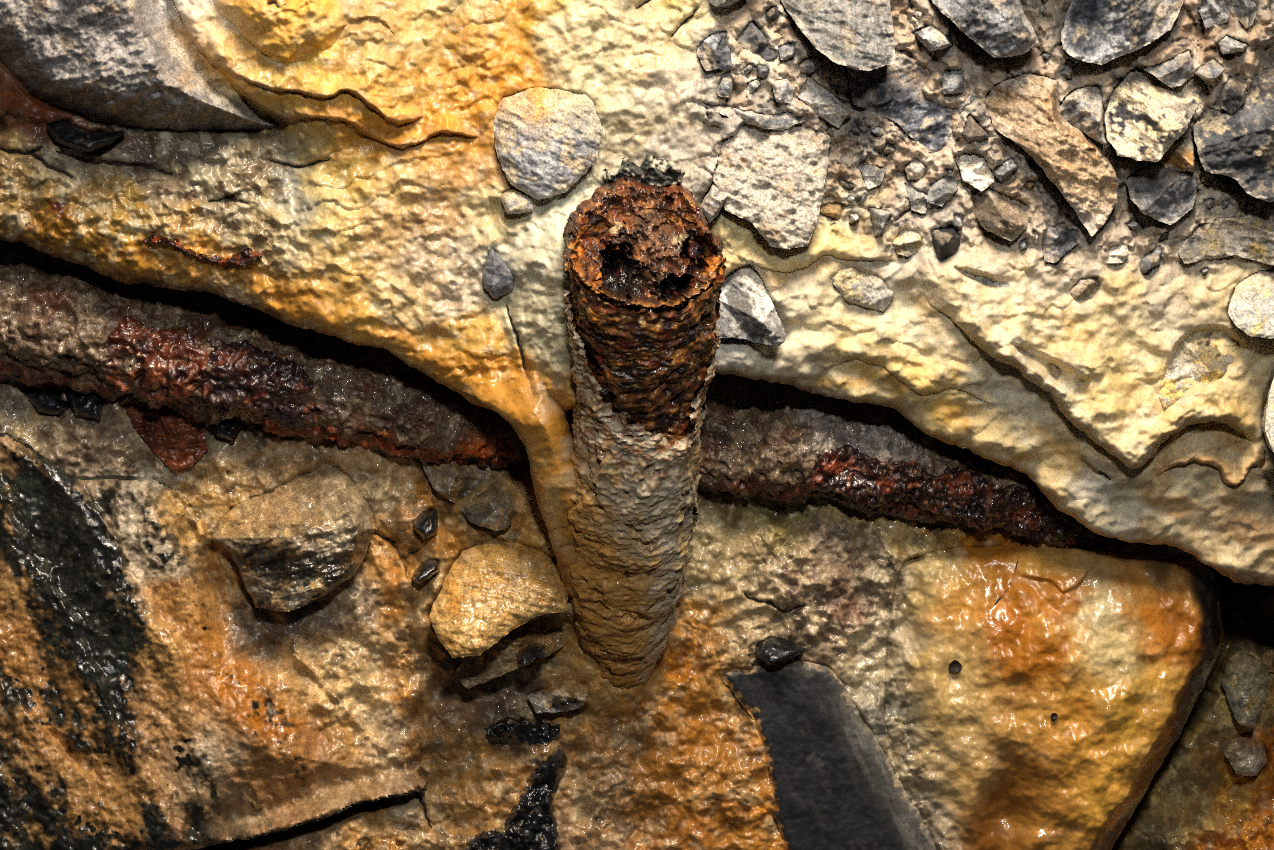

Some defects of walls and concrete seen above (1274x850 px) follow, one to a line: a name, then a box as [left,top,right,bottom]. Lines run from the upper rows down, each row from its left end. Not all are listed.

spalling [697,6,795,98]
spalling [914,11,952,52]
spalling [1198,0,1257,54]
spalling [820,124,895,236]
spalling [904,69,1018,262]
rust [137,235,263,270]
spalling [1106,220,1168,273]
rust [0,262,530,469]
rust [565,410,574,436]
spalling [561,153,727,689]
rust [698,397,1128,550]
crack [415,792,432,828]